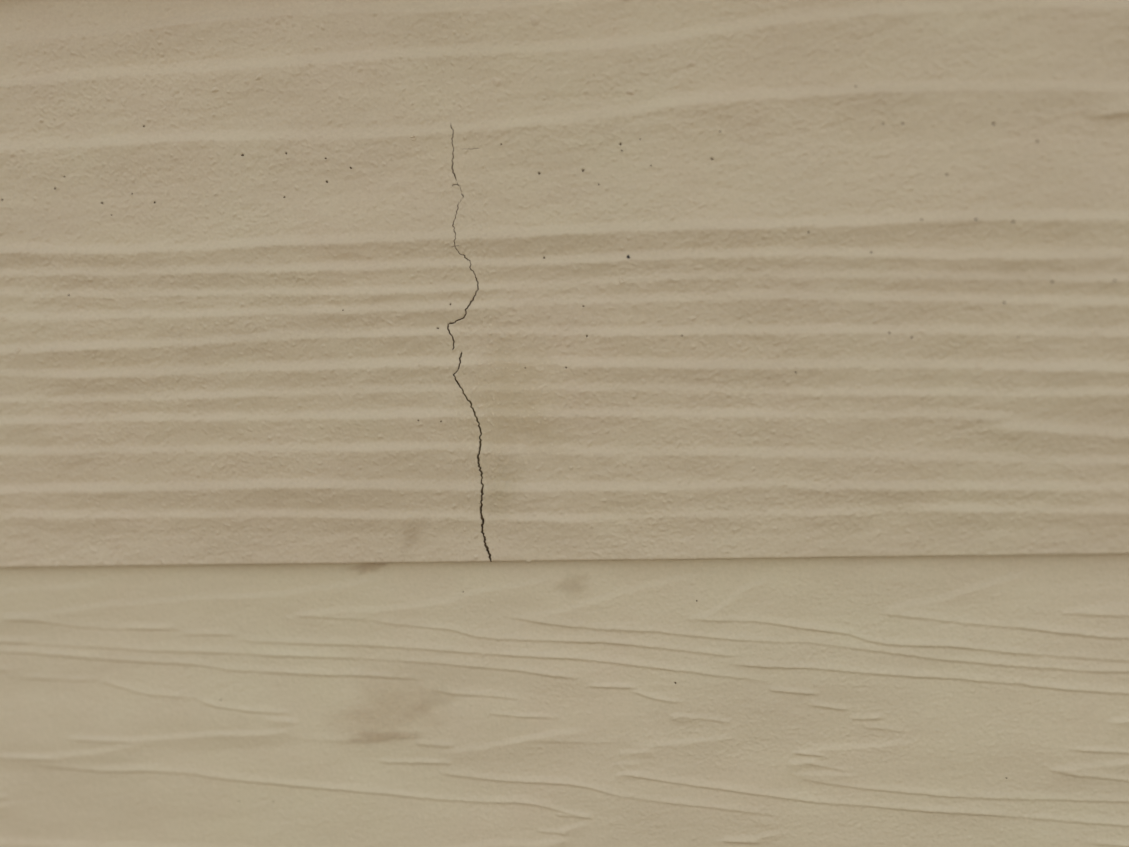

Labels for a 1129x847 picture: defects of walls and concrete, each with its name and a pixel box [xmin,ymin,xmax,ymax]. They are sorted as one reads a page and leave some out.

crack [447,127,492,562]